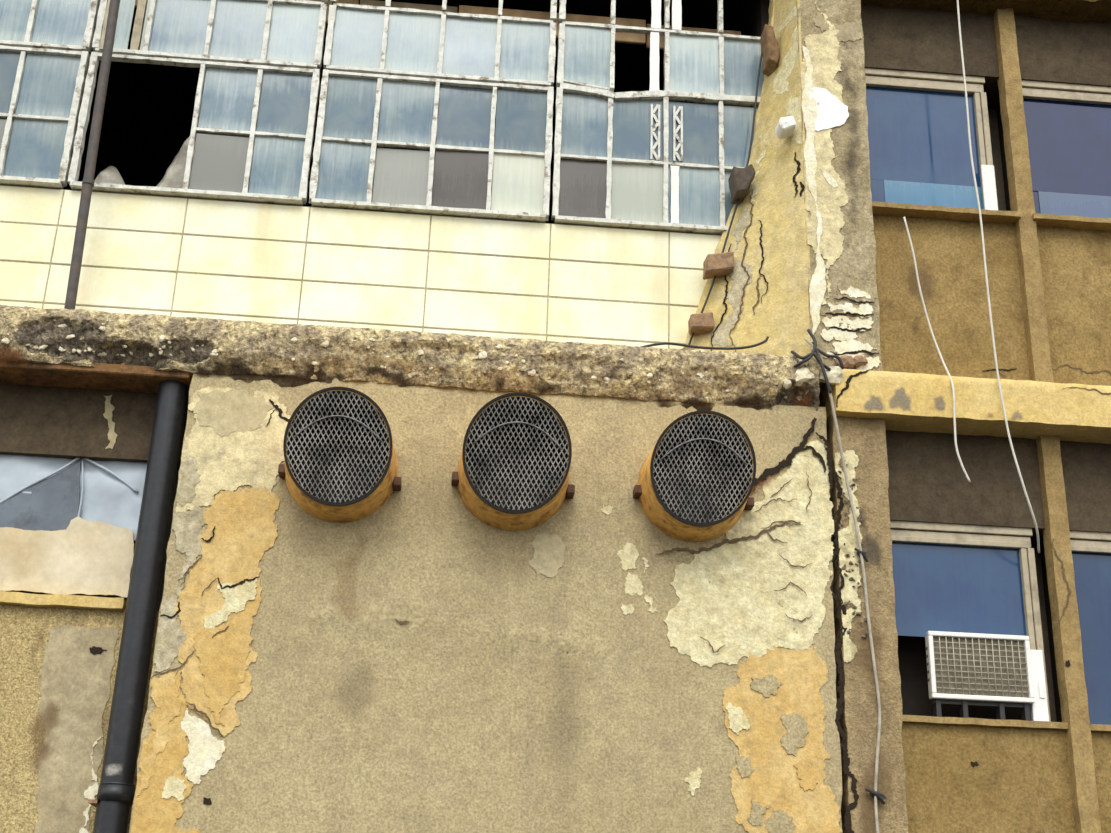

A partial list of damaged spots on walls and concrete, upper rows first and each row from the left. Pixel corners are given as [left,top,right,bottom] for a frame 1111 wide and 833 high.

spalling [1,319,218,370]
flaking render [103,395,117,449]
spalling [277,336,751,403]
crack [711,190,769,352]
flaking render [773,0,881,411]
flaking render [131,386,291,833]
crack [656,520,801,555]
flaking render [617,440,868,833]
crack [725,370,869,833]
flaking render [79,736,104,833]